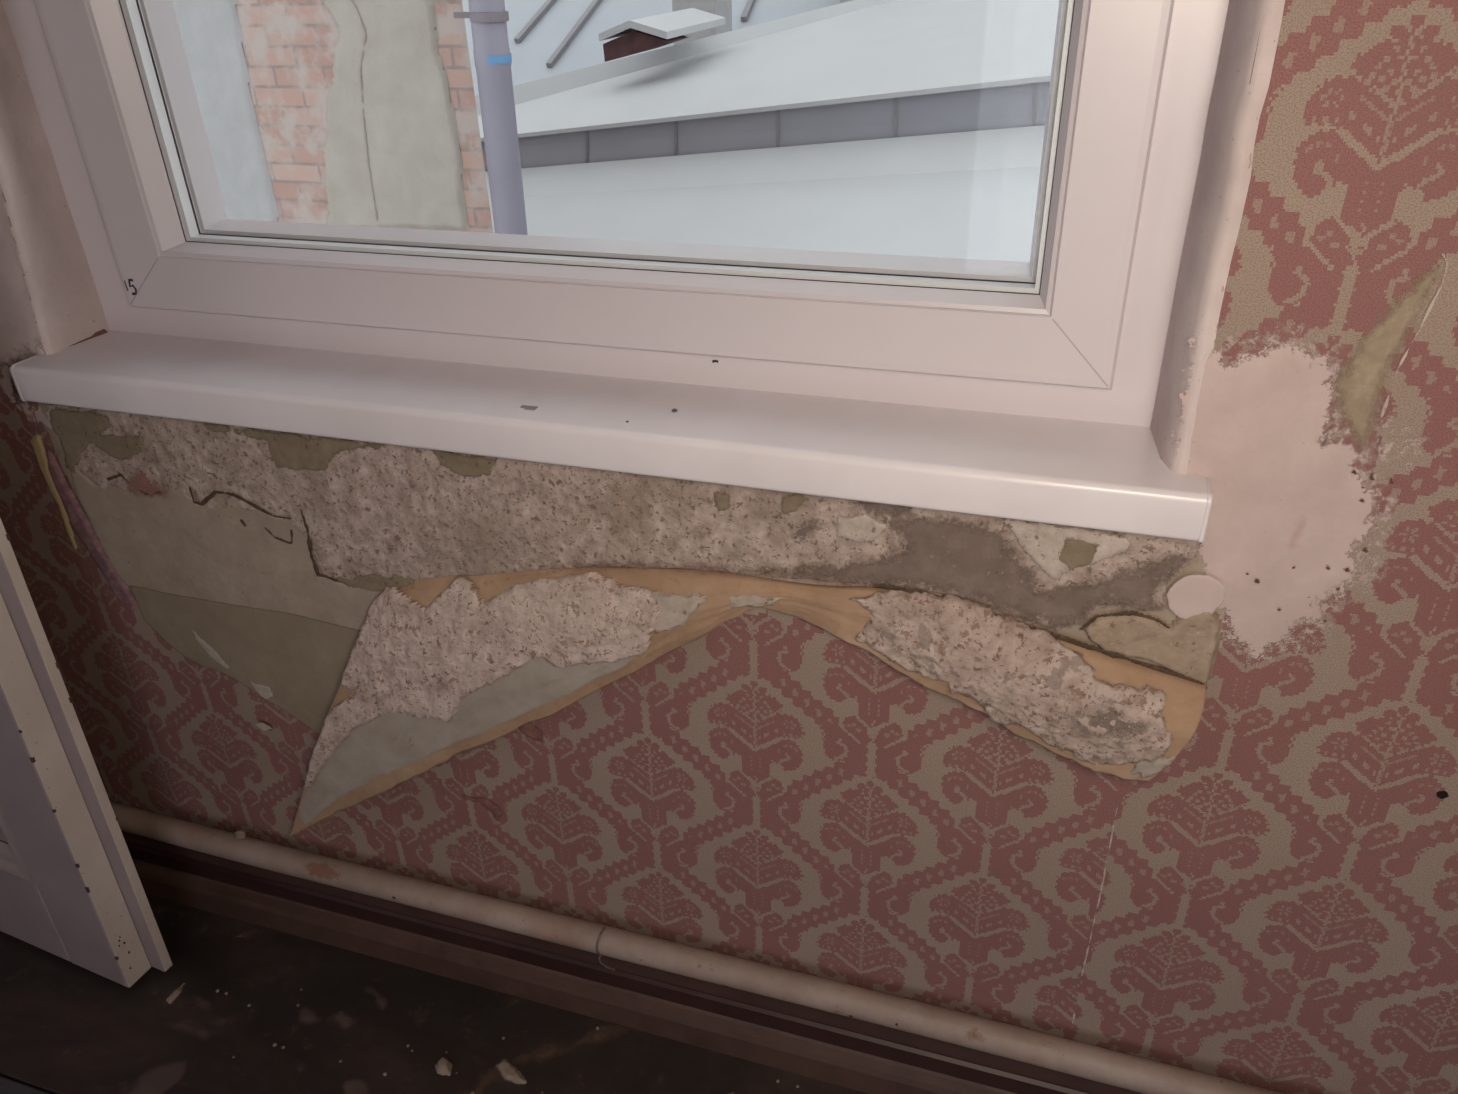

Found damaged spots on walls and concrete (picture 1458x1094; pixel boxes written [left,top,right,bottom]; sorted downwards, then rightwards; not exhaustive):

crack [107,473,339,582]
spalling [37,402,1226,735]
crack [872,583,942,598]
crack [994,610,1207,690]